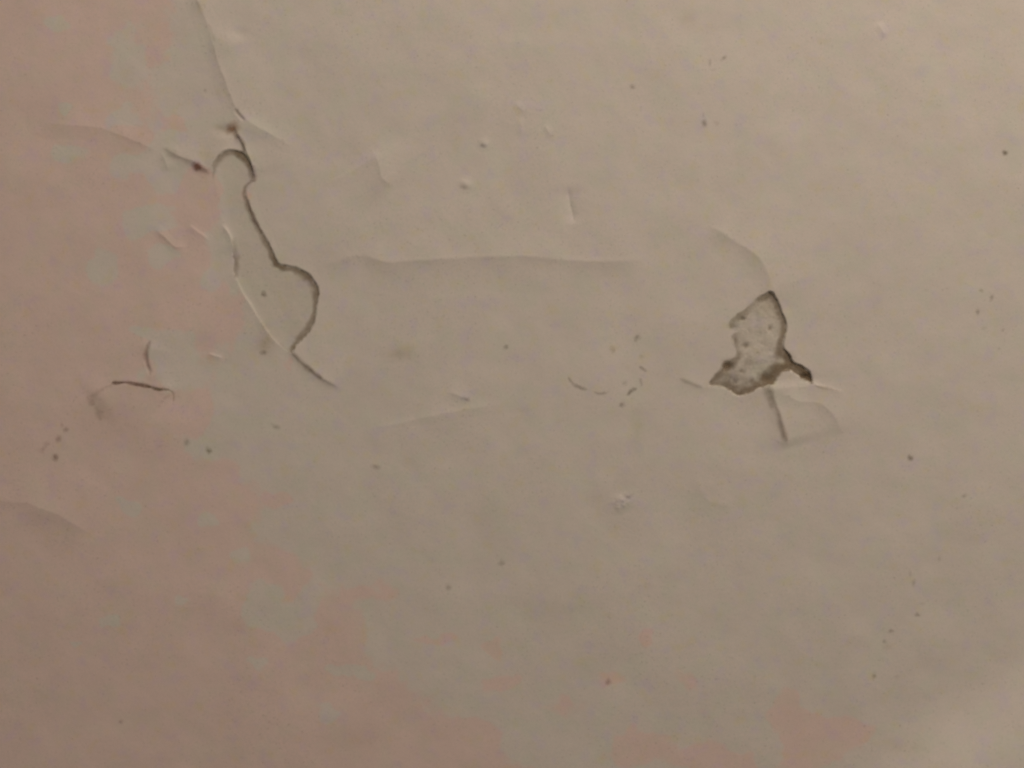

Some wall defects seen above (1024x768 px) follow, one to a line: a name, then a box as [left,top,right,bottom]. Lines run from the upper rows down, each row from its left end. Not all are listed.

peeling [159,134,326,362]
spalling [709,284,820,403]